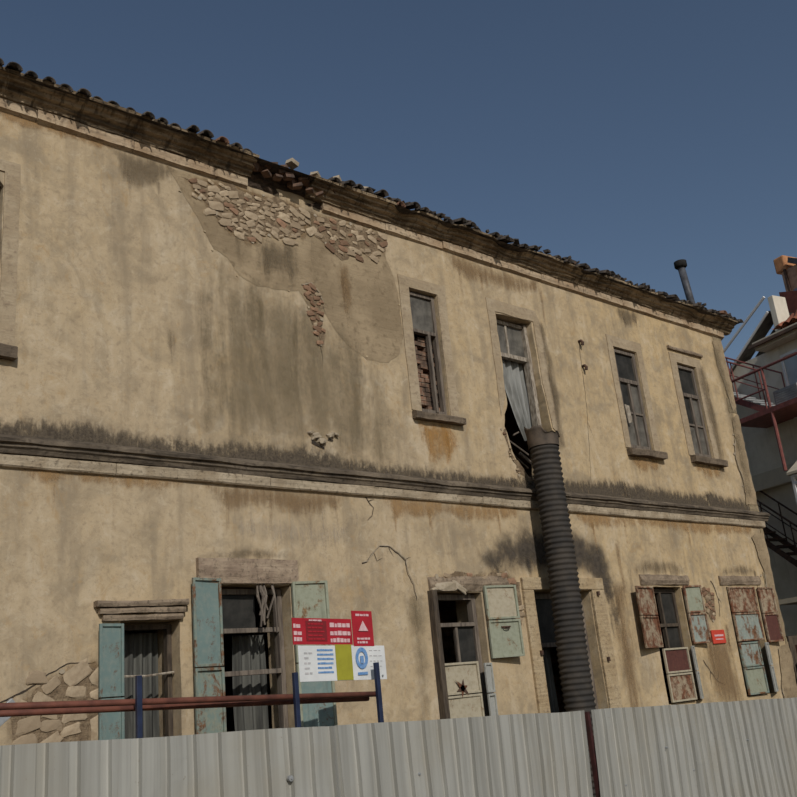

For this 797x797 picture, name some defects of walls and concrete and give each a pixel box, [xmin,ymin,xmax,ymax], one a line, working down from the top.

flaking render [166,165,403,363]
leakage [232,310,303,423]
leakage [0,420,536,489]
leakage [564,481,750,510]
crack [362,545,418,601]
spalling [13,658,115,702]
spalling [11,713,99,745]